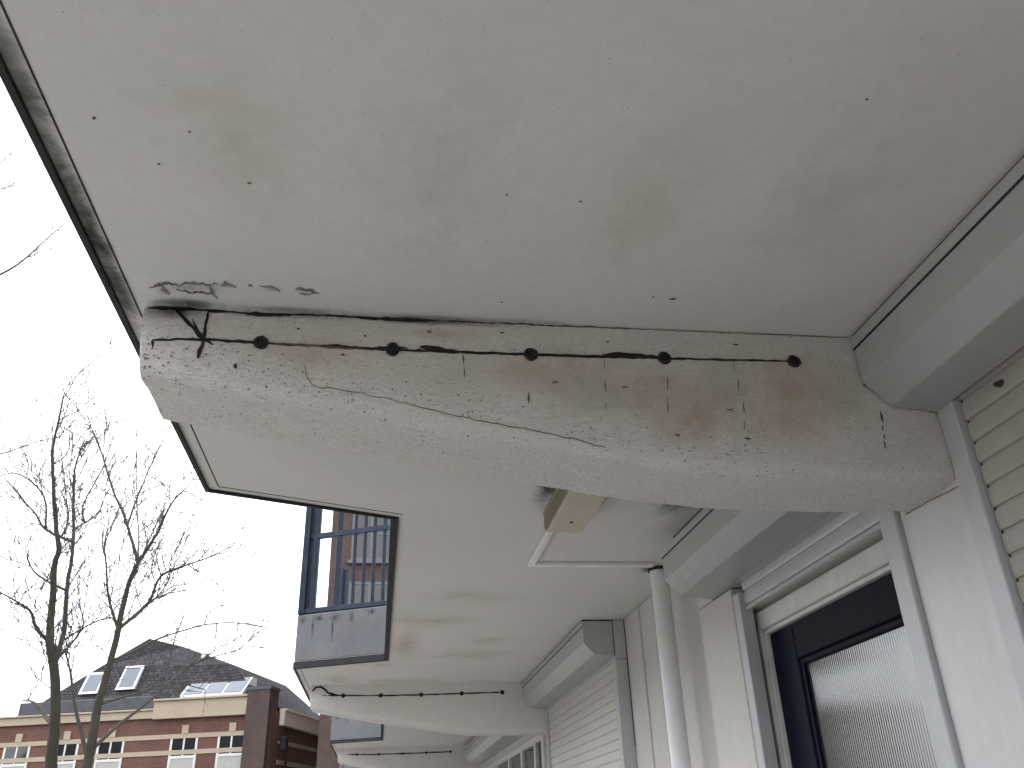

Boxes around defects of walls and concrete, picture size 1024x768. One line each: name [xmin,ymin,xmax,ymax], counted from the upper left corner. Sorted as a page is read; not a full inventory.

peeling [149,281,280,299]
crack [148,306,849,448]
crack [312,686,500,696]